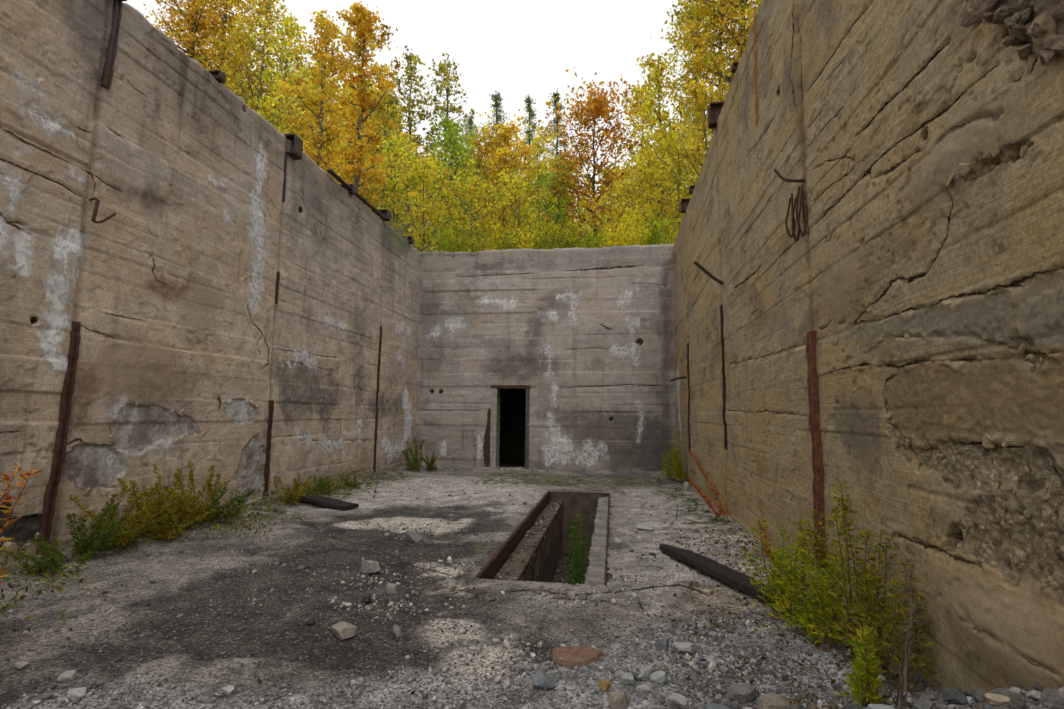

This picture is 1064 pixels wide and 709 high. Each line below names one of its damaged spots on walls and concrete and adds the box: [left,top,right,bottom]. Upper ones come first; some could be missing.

spalling [960,0,1064,66]
efflorescence [36,227,83,372]
crack [0,127,122,196]
peeling [61,401,201,495]
efflorescence [244,142,270,320]
leakage [491,281,682,471]
crack [734,189,1064,469]
spalling [885,403,1064,606]
spalling [946,141,1030,188]